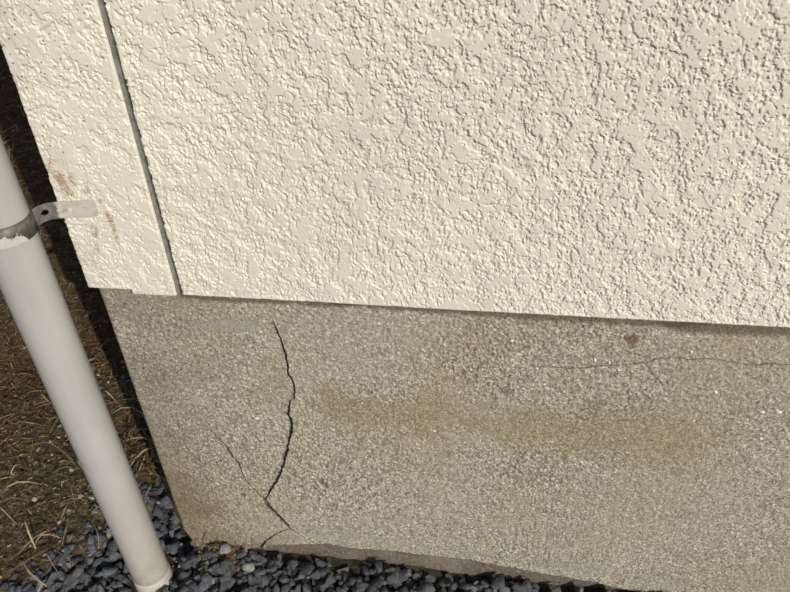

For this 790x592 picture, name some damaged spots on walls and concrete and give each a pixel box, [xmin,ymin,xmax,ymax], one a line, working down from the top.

crack [212,321,305,551]
crack [532,357,790,369]